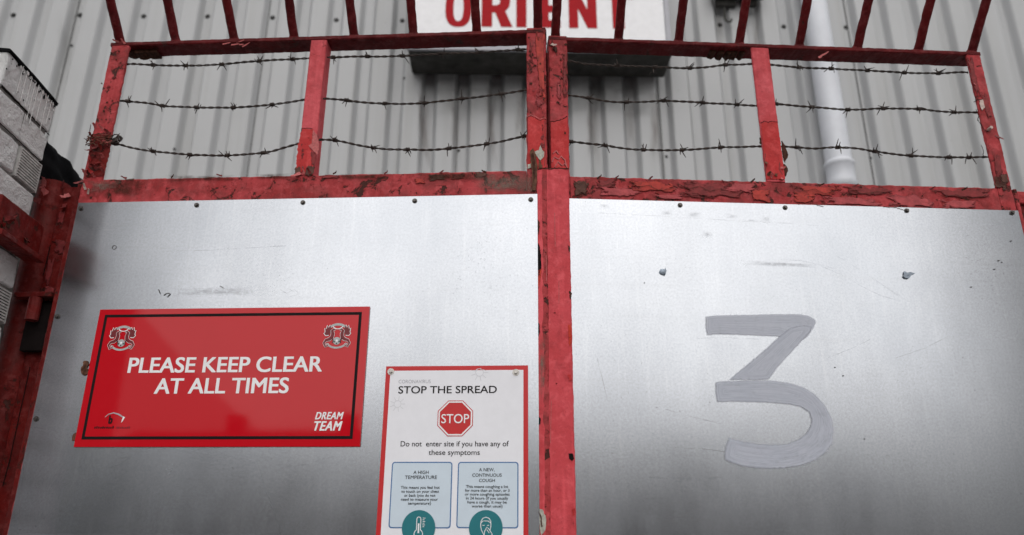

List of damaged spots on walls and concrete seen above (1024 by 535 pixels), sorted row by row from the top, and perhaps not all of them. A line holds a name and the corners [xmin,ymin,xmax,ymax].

spalling [6,58,57,120]
peeling [527,32,569,169]
peeling [967,57,1003,139]
peeling [33,76,116,225]
peeling [415,170,488,183]
peeling [573,121,990,210]